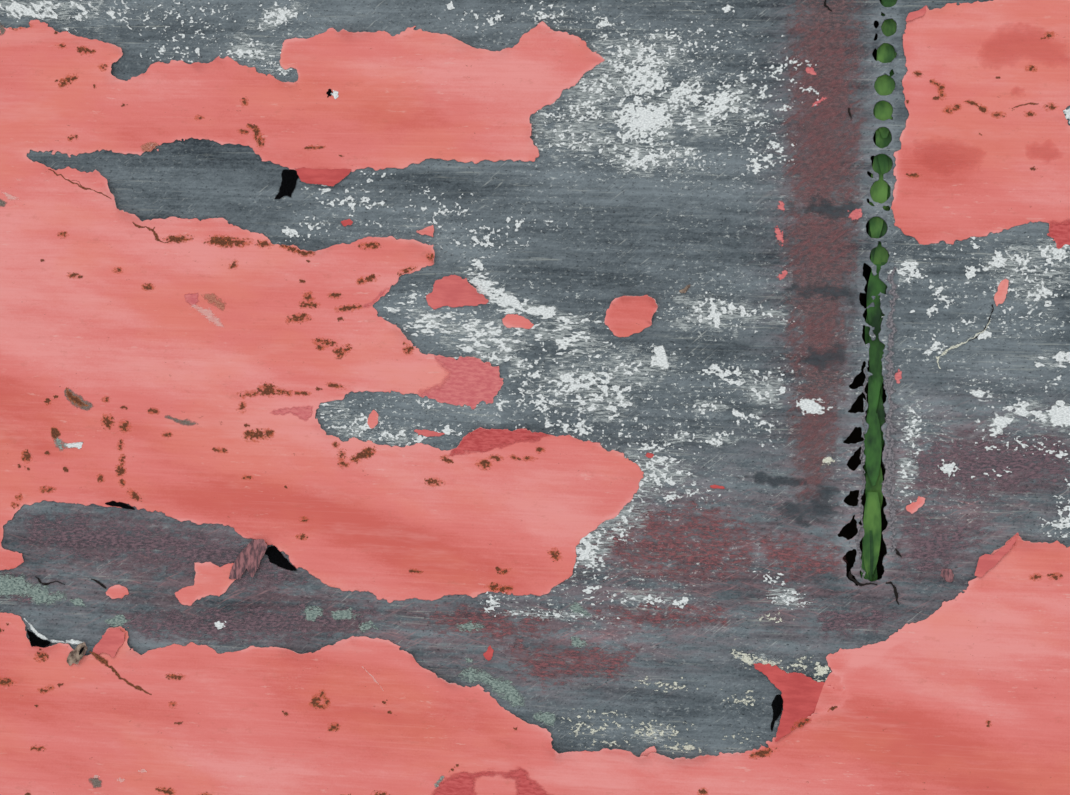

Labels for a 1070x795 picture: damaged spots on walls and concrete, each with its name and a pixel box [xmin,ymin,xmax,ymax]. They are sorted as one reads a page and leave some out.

peeling [891,0,1070,249]
corrosion [287,279,317,324]
peeling [0,20,658,606]
peeling [994,279,1009,306]
corrosion [239,382,343,410]
corrosion [101,406,142,501]
corrosion [241,423,276,440]
corrosion [333,442,375,467]
peeling [906,496,925,514]
peeling [826,535,1070,761]
crack [89,651,152,695]
peeling [0,612,911,795]